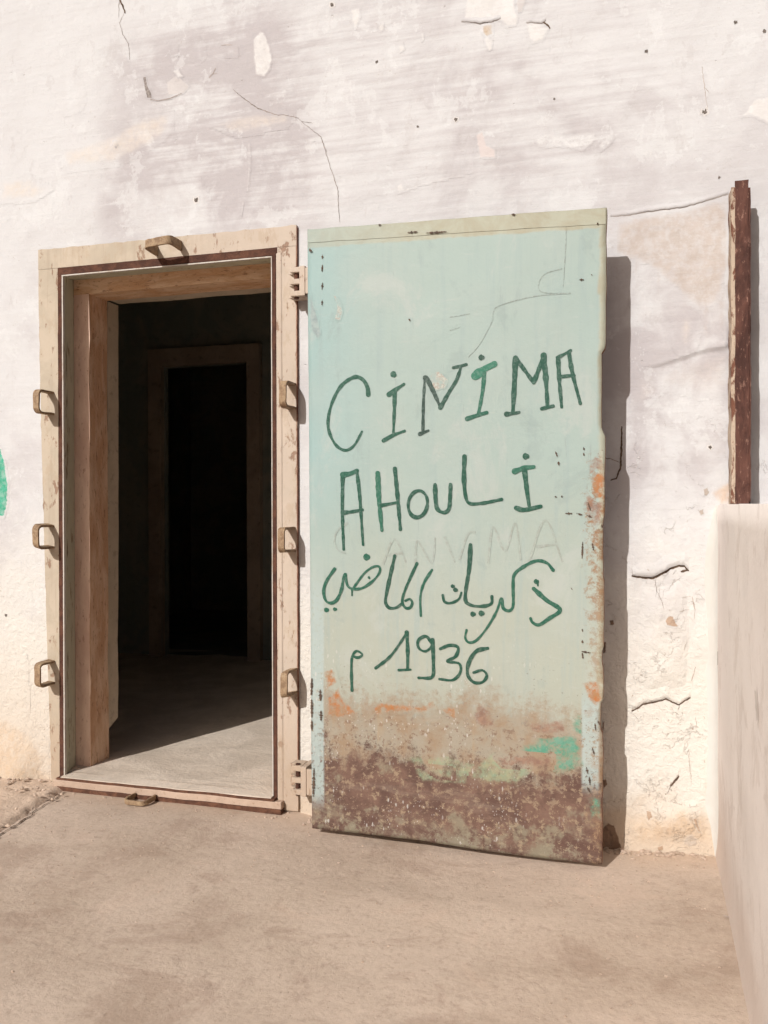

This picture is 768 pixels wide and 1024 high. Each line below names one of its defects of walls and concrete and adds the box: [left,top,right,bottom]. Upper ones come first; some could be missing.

flaking render [253,30,273,78]
flaking render [463,0,549,44]
crack [210,45,340,221]
crack [632,551,695,618]
crack [632,643,718,792]